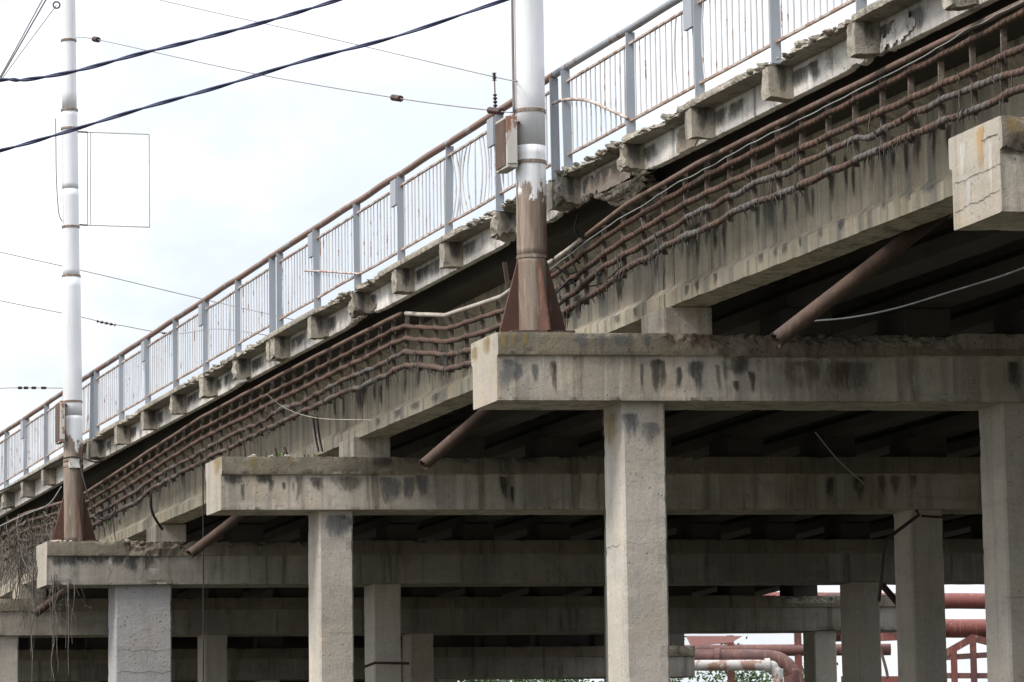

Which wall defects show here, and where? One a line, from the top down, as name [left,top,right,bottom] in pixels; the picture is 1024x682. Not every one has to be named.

spalling [880,12,915,53]
water stain [629,144,655,163]
water stain [891,122,965,169]
peeling [585,163,656,211]
water stain [756,186,814,225]
water stain [828,157,854,195]
water stain [680,222,726,255]
spalling [660,333,849,358]
spalling [864,333,1024,349]
water stain [640,357,755,390]
water stain [625,413,659,439]
water stain [373,458,427,499]